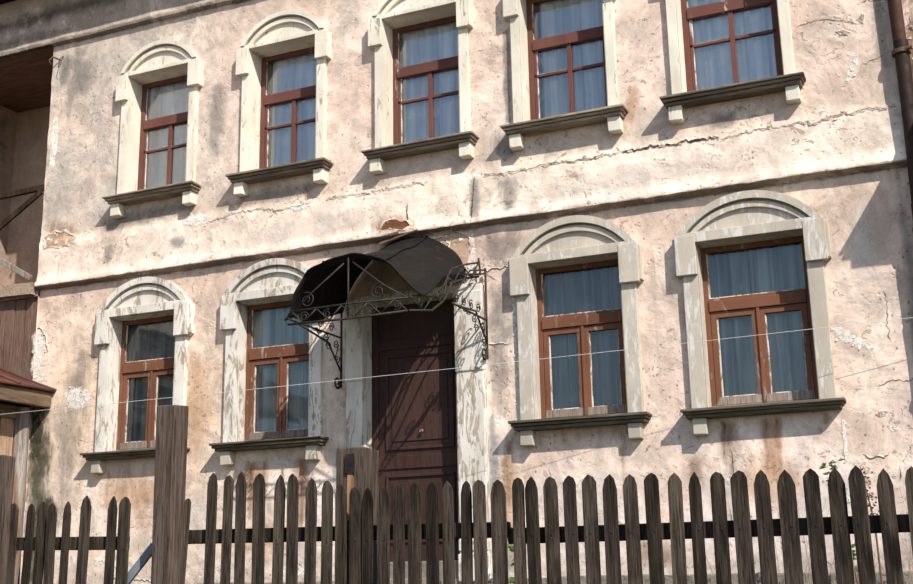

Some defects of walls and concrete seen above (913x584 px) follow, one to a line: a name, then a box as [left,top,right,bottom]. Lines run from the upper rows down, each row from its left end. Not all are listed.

crack [470,103,897,221]
spalling [42,228,79,250]
crack [204,181,458,247]
spalling [378,218,477,276]
peeling [831,327,873,350]